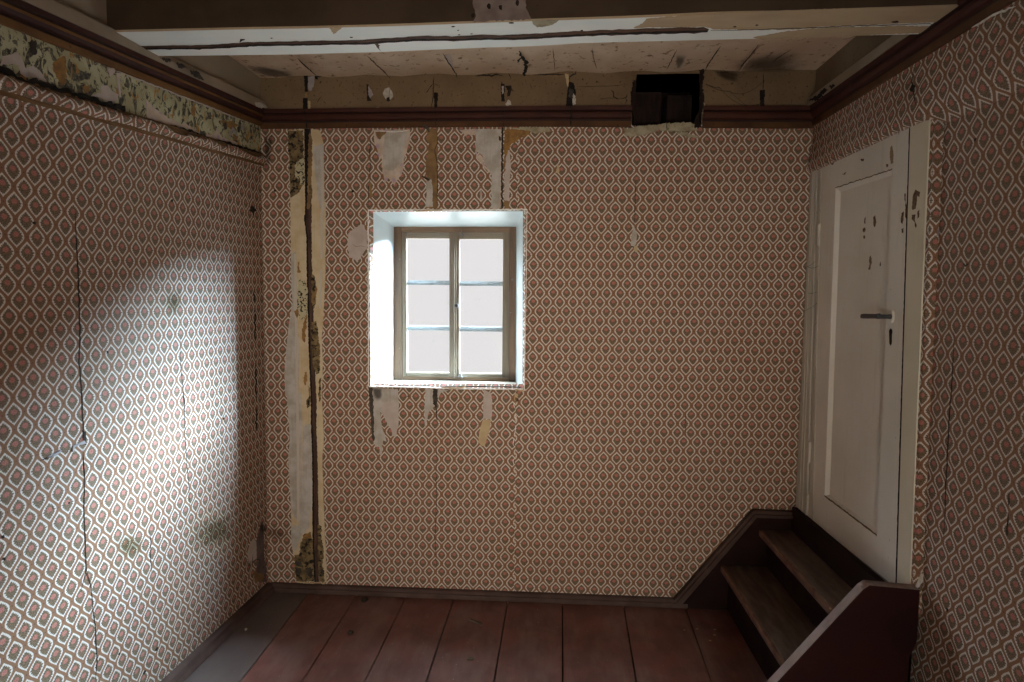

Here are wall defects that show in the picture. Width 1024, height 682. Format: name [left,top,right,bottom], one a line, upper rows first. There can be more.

peeling [473,0,559,27]
crack [425,49,628,126]
spalling [624,69,705,138]
peeling [901,190,920,233]
crack [72,214,98,679]